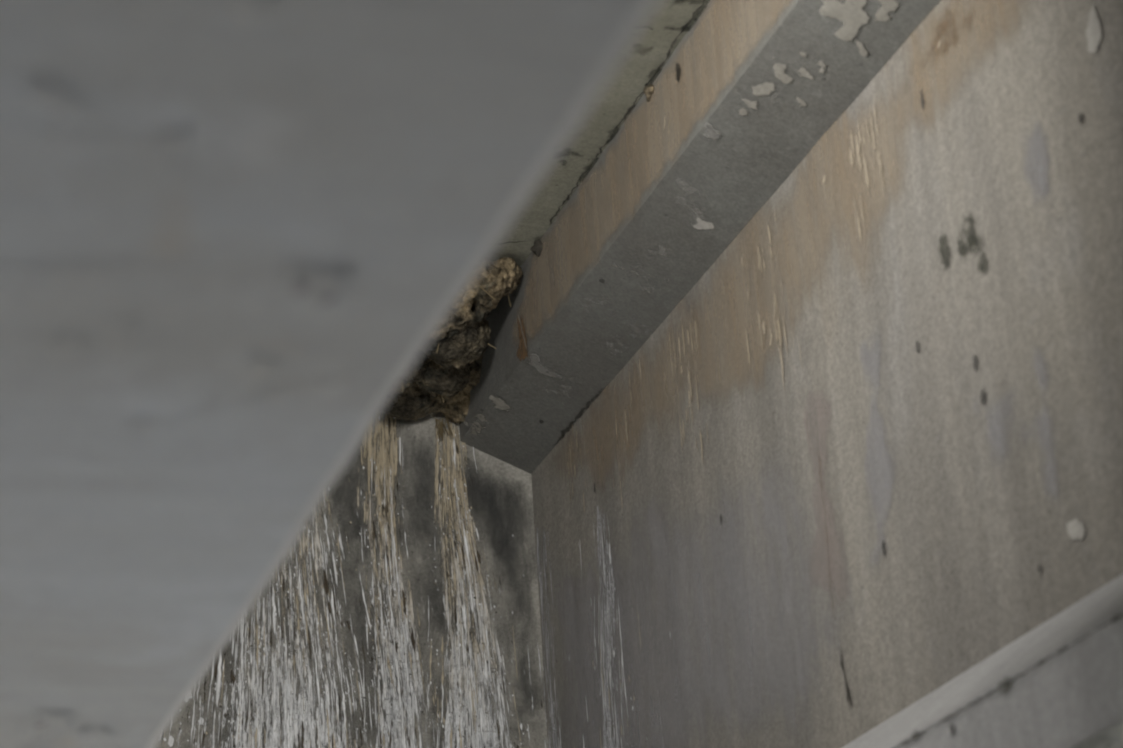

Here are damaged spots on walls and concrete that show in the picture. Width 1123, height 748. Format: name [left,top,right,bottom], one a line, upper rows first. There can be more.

peeling [819,0,899,57]
peeling [739,44,826,116]
peeling [693,217,714,230]
leakage [156,414,587,748]